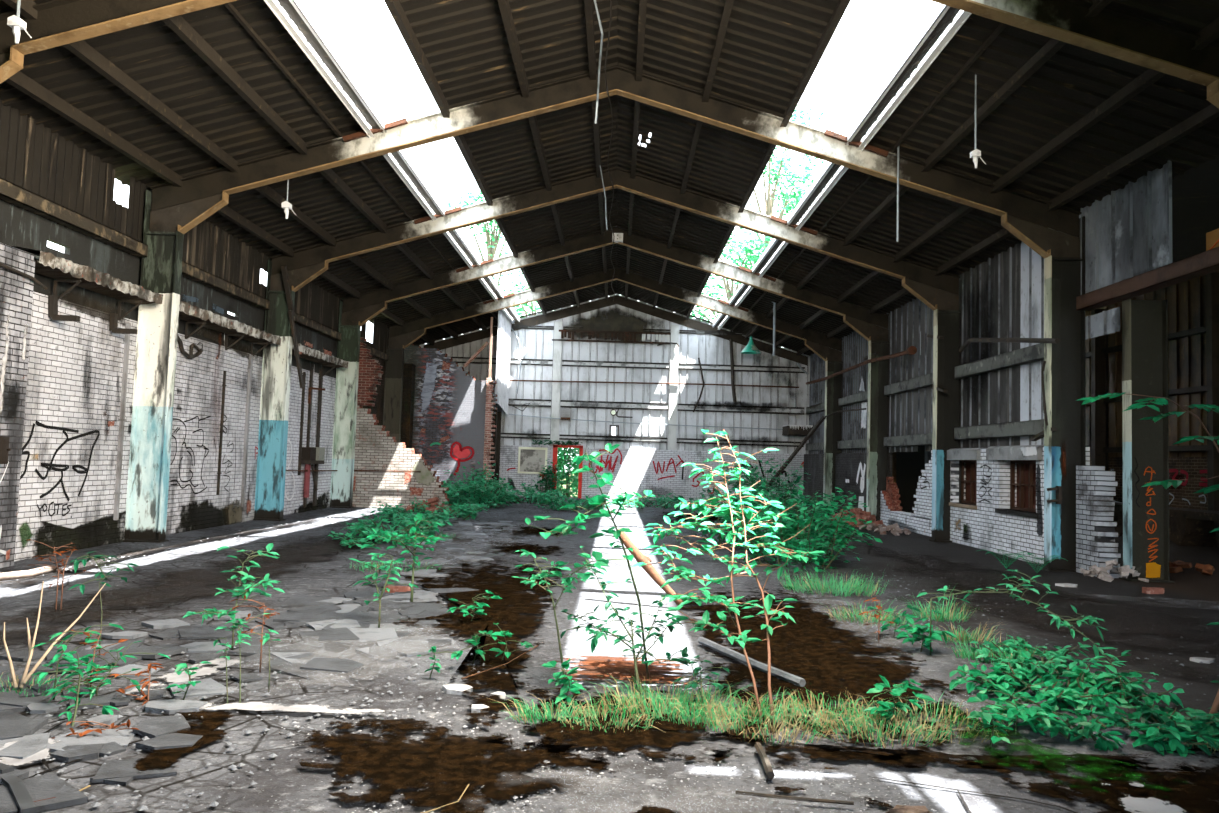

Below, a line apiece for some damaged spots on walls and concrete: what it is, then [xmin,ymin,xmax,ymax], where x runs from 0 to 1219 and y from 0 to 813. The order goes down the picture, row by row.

damp [19,511,126,559]
crack [23,722,84,780]